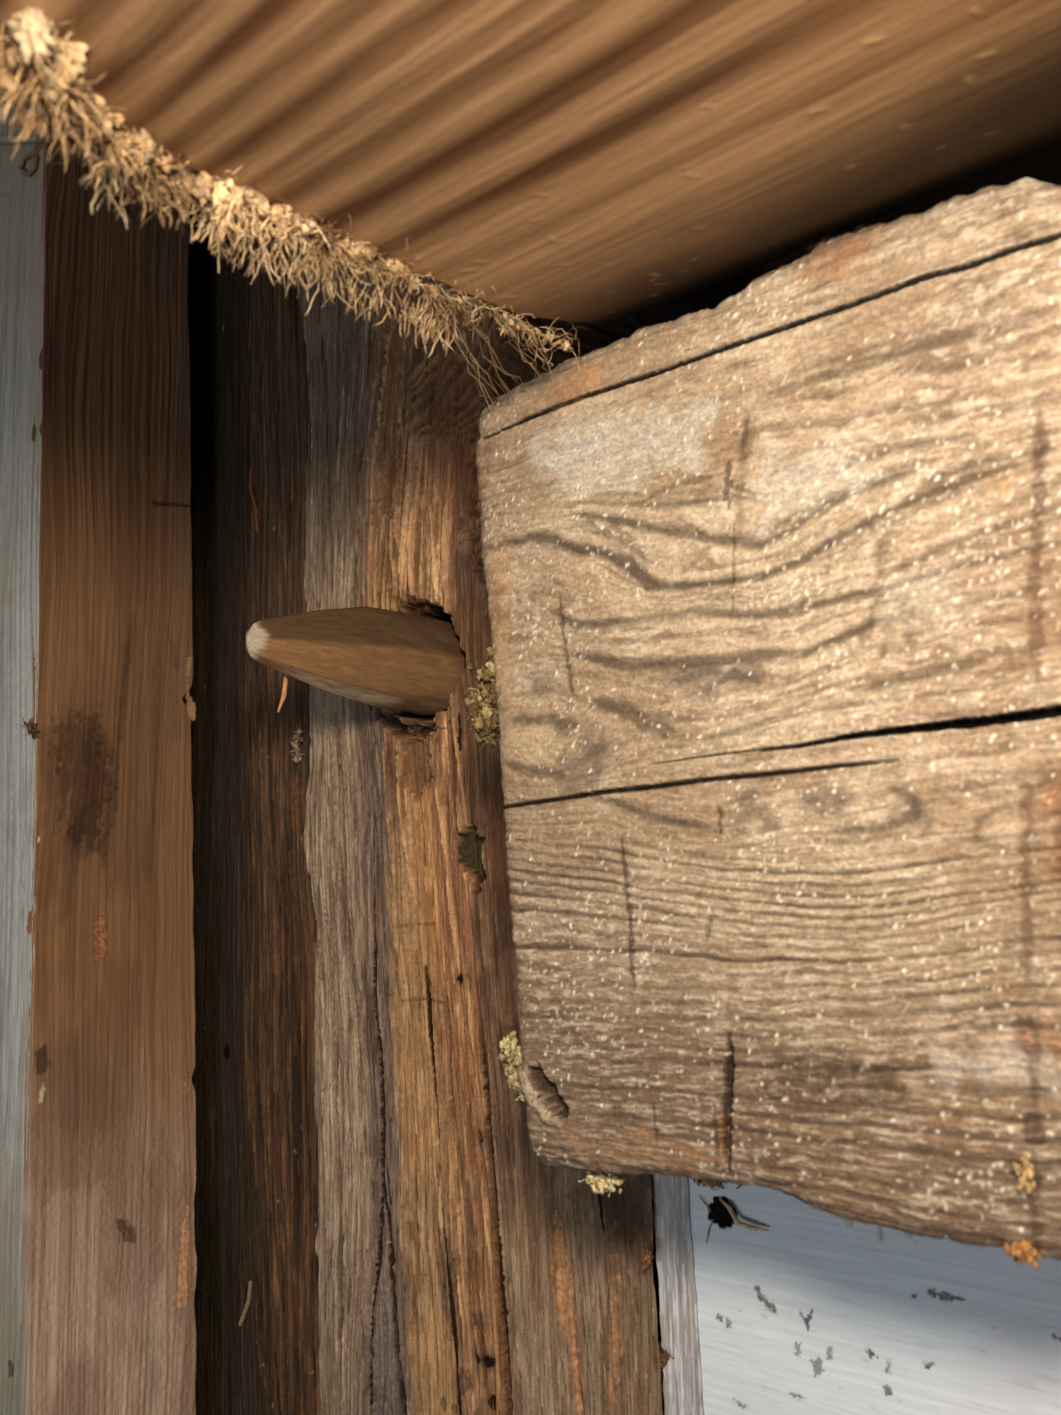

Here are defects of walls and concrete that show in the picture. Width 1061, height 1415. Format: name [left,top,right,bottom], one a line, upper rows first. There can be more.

crack [485,233,1061,440]
crack [506,705,1061,808]
peeling [754,1285,776,1313]
peeling [911,1289,965,1302]
peeling [795,1310,832,1377]
peeling [868,1349,892,1396]